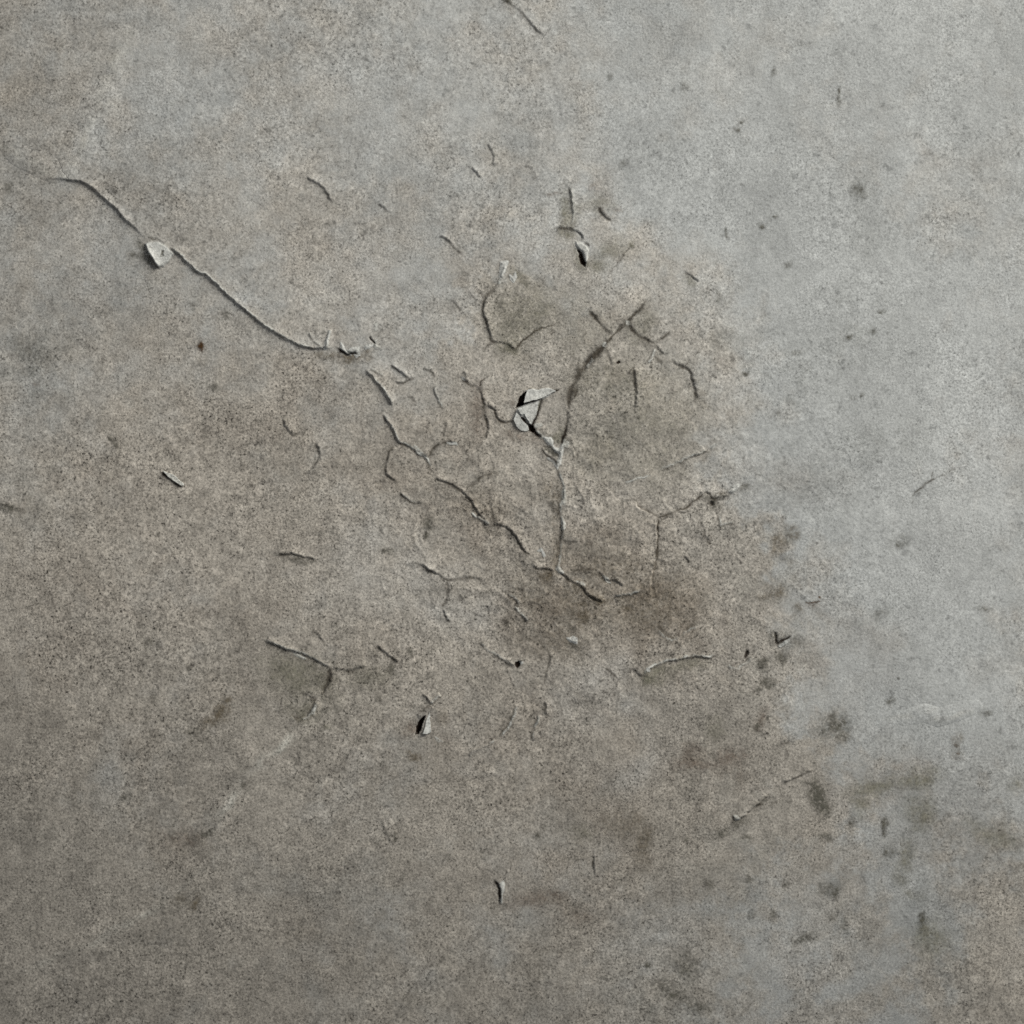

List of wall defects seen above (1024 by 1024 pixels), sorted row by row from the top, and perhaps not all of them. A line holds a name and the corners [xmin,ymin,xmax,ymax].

flaking render [132,239,381,363]
crack [482,260,552,351]
crack [368,369,458,462]
crack [461,376,511,425]
flaking render [513,388,569,469]
crack [568,307,669,404]
crack [451,444,727,618]
crack [294,670,332,719]
crack [644,627,712,683]
damp [809,782,829,811]